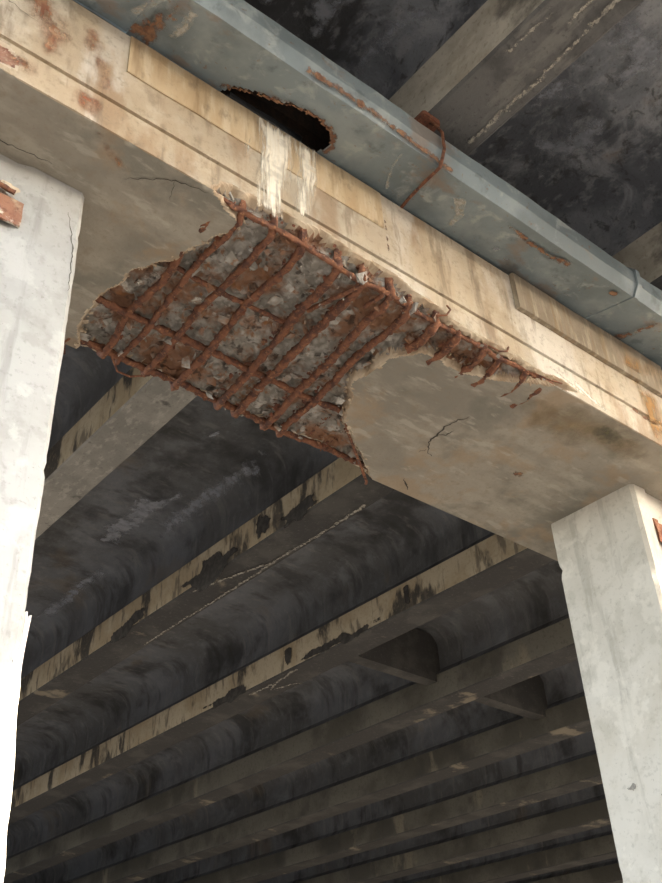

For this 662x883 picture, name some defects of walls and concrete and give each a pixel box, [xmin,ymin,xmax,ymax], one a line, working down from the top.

rust [34,0,67,52]
rust [129,5,178,46]
rust [79,93,99,109]
rust [306,67,453,172]
leakage [257,118,317,216]
spalling [63,180,579,485]
crack [419,418,467,456]